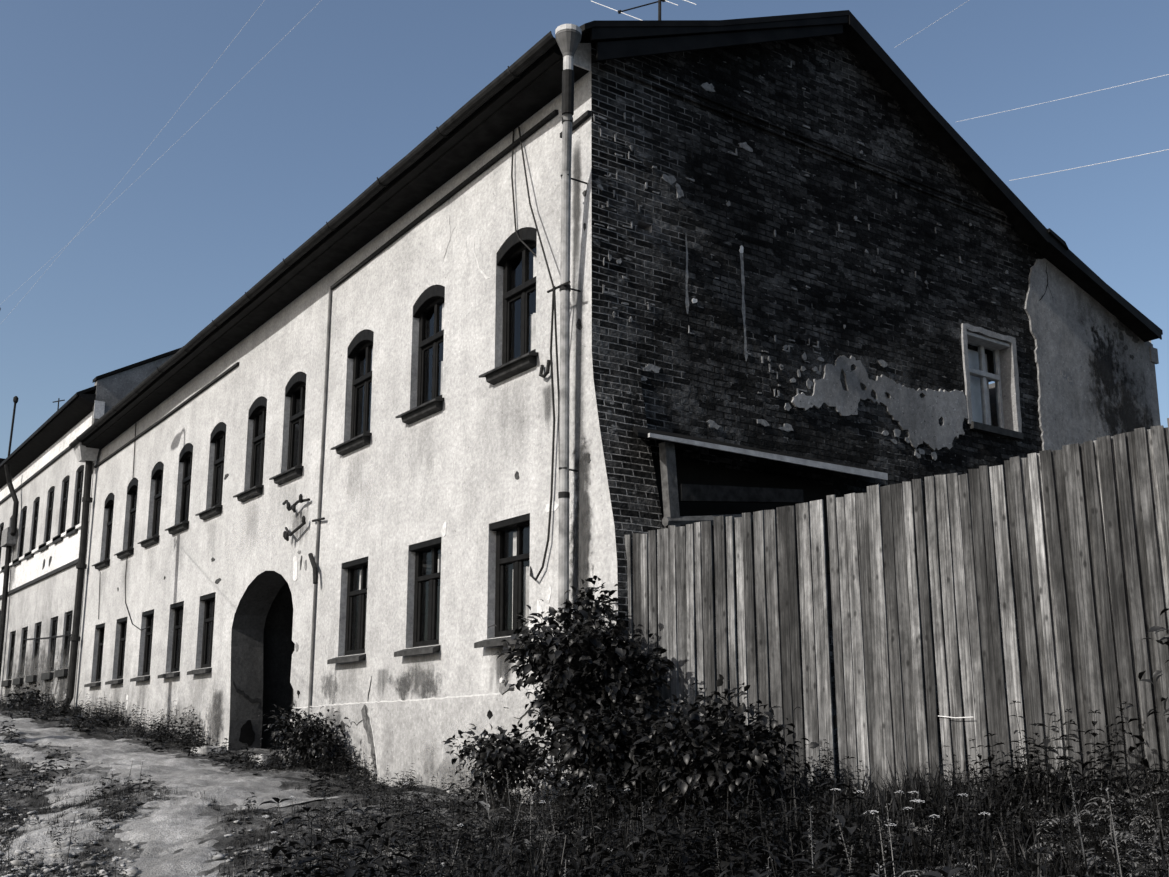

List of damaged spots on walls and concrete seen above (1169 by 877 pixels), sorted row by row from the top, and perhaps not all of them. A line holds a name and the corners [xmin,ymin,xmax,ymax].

peeling [582,165,642,279]
spalling [615,145,695,198]
spalling [728,142,753,156]
spalling [641,364,661,381]
peeling [745,335,969,461]
damp [1089,329,1153,436]
damp [569,425,593,628]
damp [389,671,435,698]